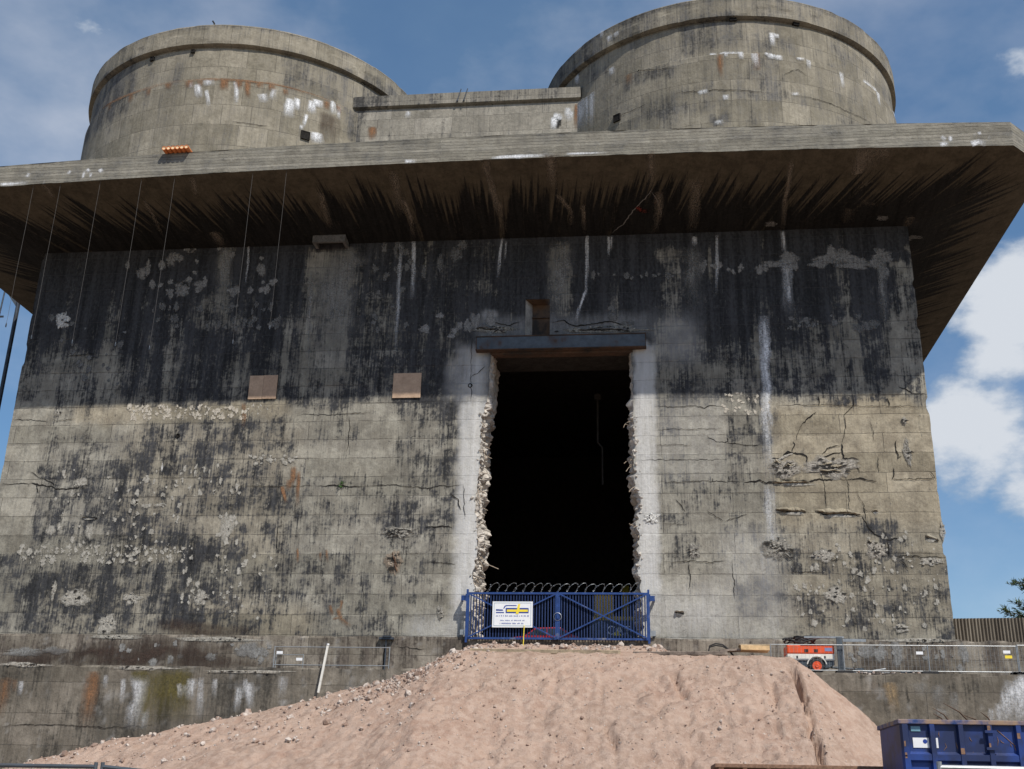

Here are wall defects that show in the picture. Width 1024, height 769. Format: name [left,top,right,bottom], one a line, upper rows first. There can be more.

rust [187,78,299,94]
peeling [125,248,281,332]
peeling [699,245,893,279]
peeling [127,403,249,421]
water stain [760,322,771,437]
crack [7,472,85,492]
crack [649,386,945,569]
peeling [17,463,256,616]
spalling [762,537,794,560]
peeling [794,529,969,673]